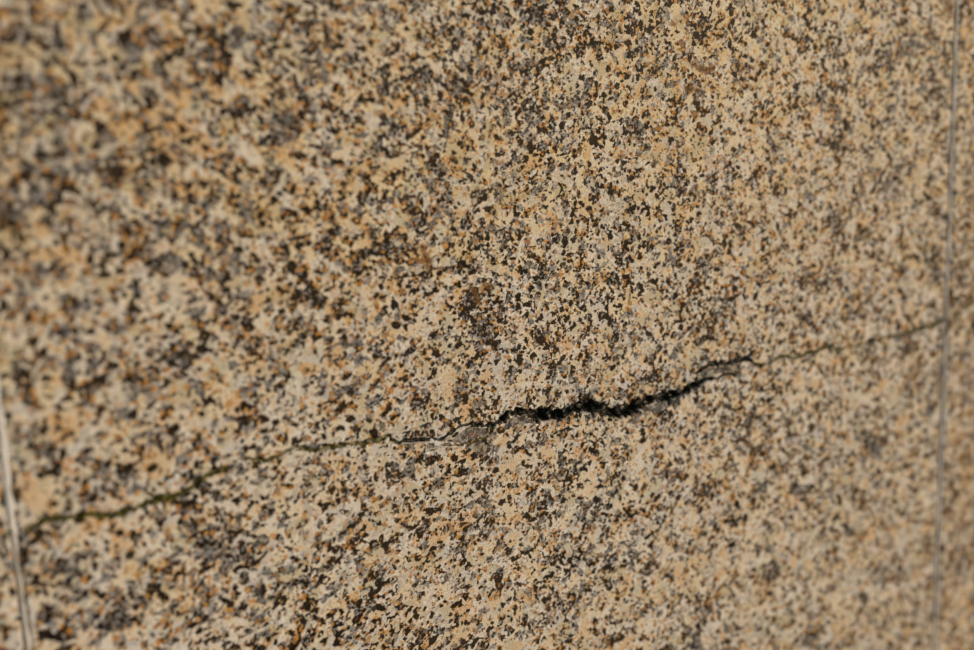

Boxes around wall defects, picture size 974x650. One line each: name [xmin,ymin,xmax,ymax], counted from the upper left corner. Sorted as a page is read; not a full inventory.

crack [25,303,974,531]